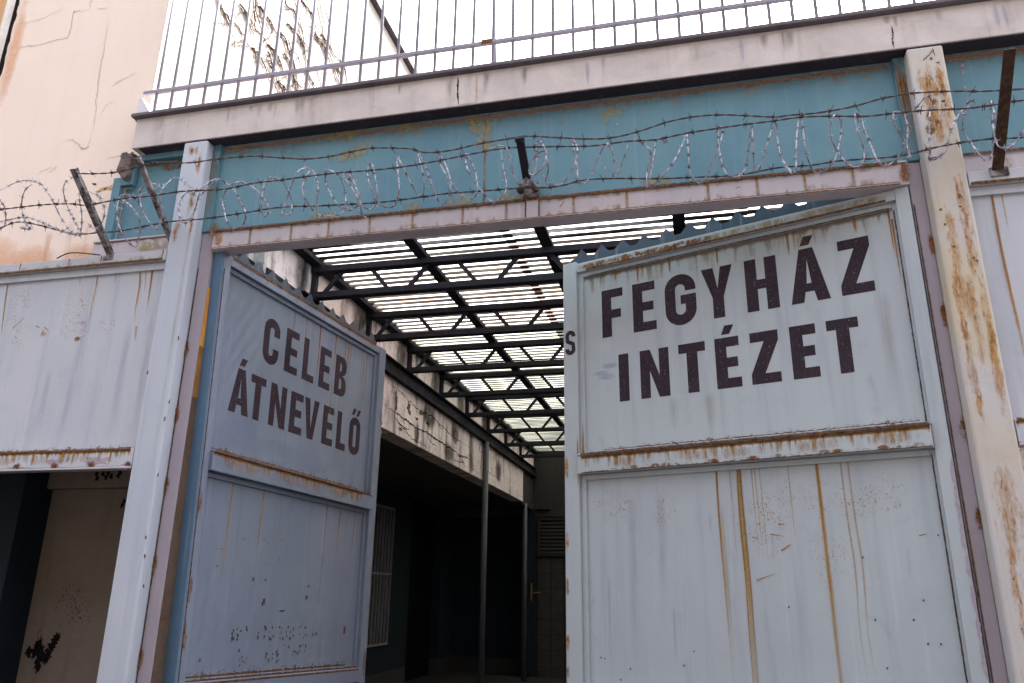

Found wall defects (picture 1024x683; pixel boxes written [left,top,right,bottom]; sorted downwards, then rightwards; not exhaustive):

crack [0,0,133,158]
rust [145,47,1024,683]
rust [0,445,134,469]
peeling [24,632,61,674]